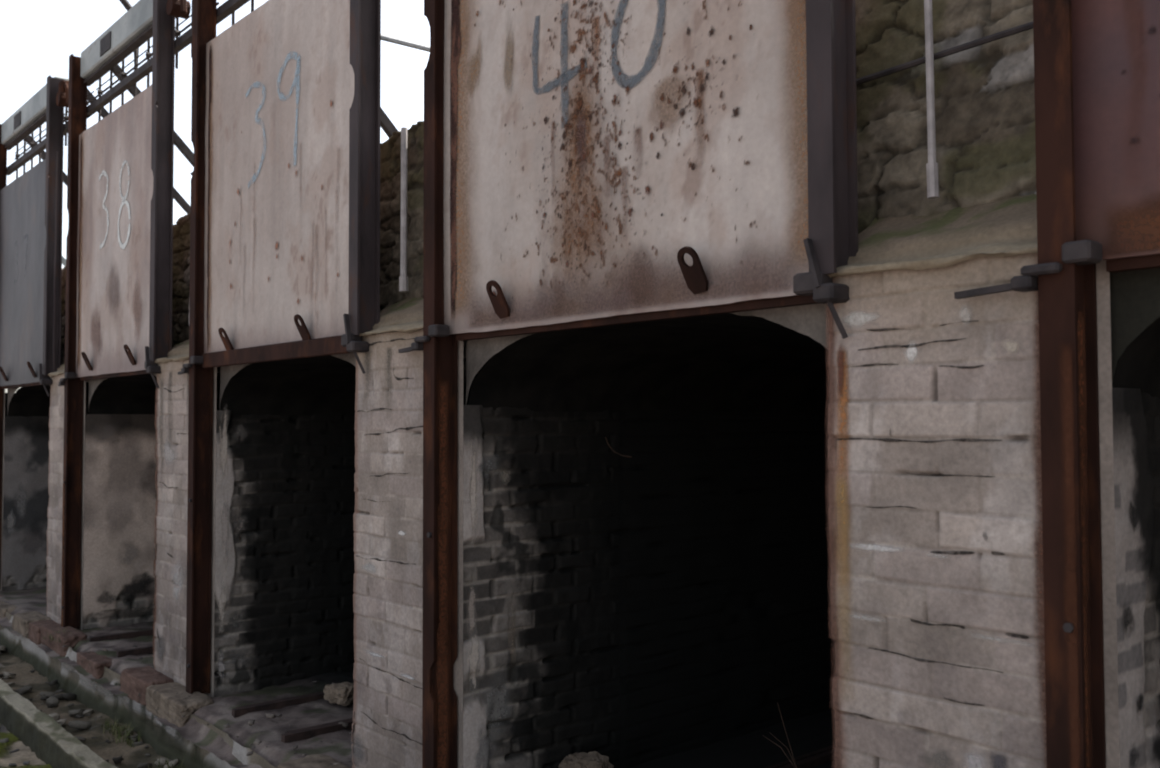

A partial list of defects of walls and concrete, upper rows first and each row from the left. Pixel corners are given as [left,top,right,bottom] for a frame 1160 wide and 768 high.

rust [450,0,787,326]
flaking render [220,417,245,473]
crack [838,432,1002,443]
flaking render [1129,502,1138,531]
crack [932,549,1005,557]
rust [1034,304,1047,768]
rust [1061,315,1090,768]
crack [911,619,964,629]
crack [1007,632,1028,640]
flaking render [1124,607,1134,631]
crack [870,648,1003,673]
flaking render [468,587,511,768]